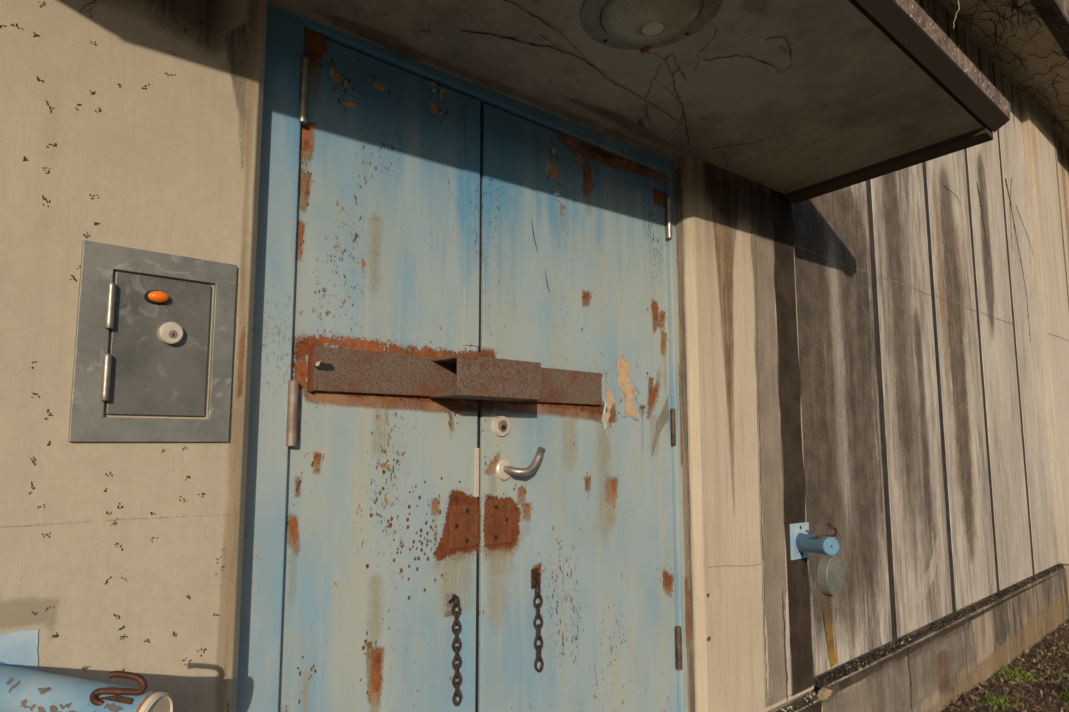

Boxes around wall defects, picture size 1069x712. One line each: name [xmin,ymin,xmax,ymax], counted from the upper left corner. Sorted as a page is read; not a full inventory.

rust [297,123,316,259]
rust [555,131,666,208]
damp [1053,128,1069,305]
rust [292,329,616,430]
peeling [601,354,645,435]
rust [647,299,668,355]
damp [711,183,737,451]
damp [883,173,932,547]
damp [933,172,974,560]
rust [387,481,533,581]
rust [360,631,383,705]
damp [804,622,976,712]